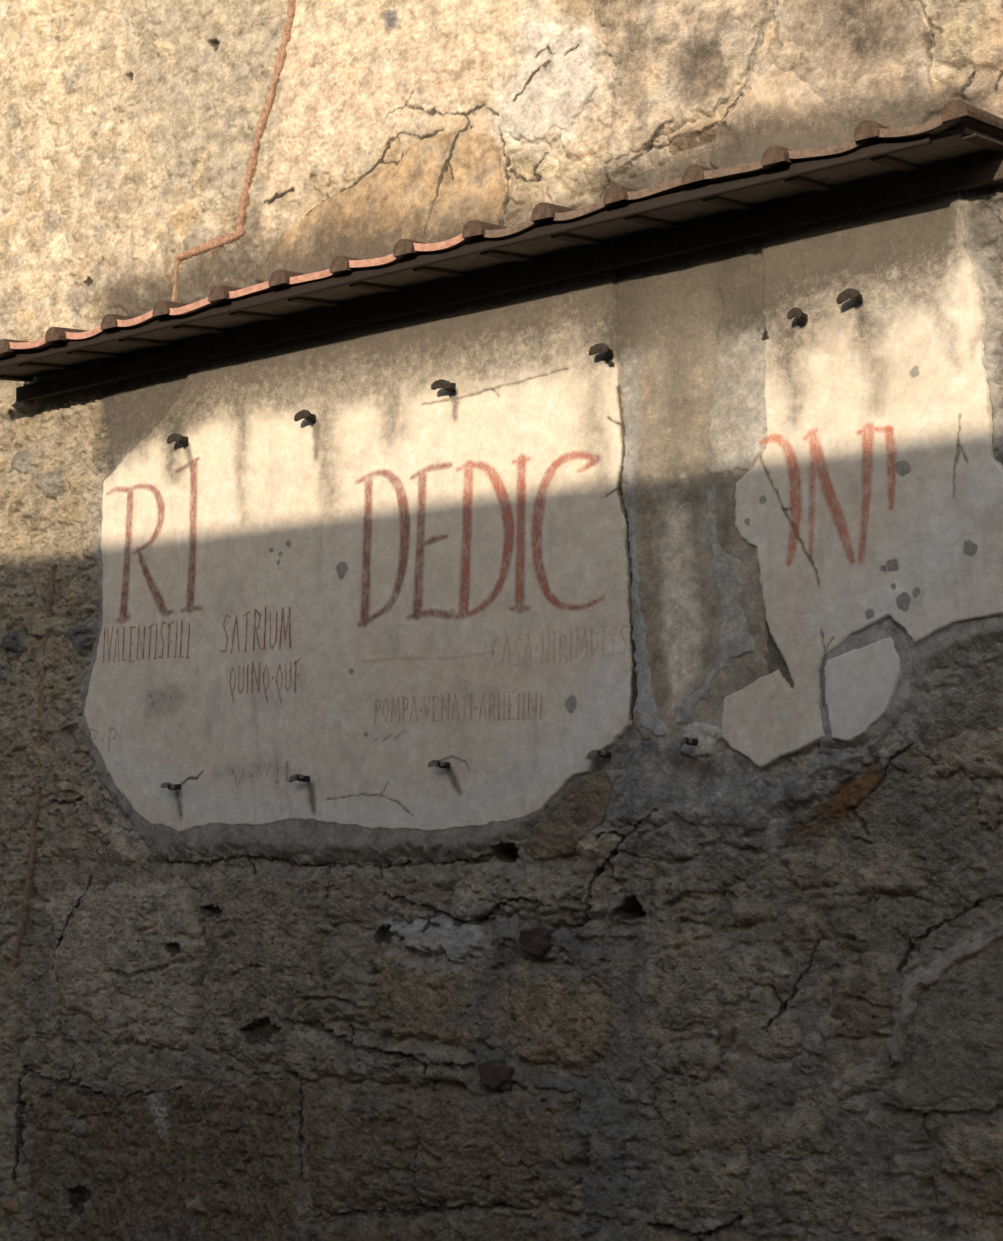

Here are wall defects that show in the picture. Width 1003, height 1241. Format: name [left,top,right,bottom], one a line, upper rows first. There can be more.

crack [264,45,579,240]
crack [600,0,783,197]
water stain [603,87,987,195]
crack [920,0,943,59]
water stain [102,157,992,471]
crack [760,456,820,584]
peeling [761,610,900,769]
peeling [915,614,1002,646]